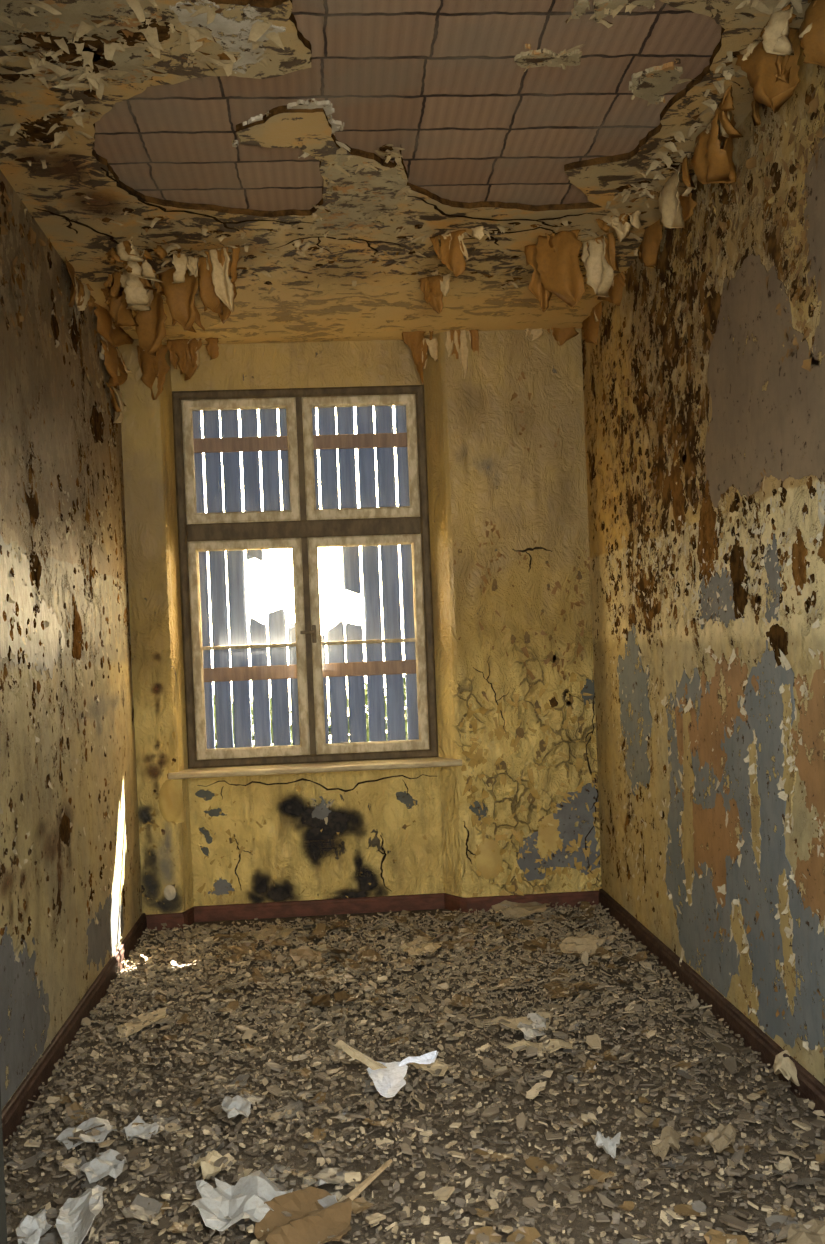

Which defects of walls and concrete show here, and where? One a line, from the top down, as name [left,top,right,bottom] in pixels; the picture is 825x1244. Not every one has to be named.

peeling [247,12,284,61]
peeling [386,222,521,314]
peeling [42,216,343,562]
peeling [402,330,479,384]
peeling [469,520,528,597]
peeling [0,540,123,836]
peeling [460,548,602,897]
peeling [705,645,744,680]